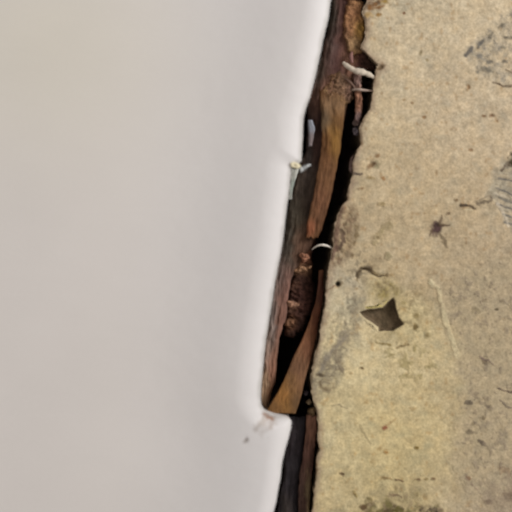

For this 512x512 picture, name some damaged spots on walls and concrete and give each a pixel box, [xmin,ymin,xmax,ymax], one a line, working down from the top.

spalling [352,153,387,191]
spalling [329,202,362,272]
crack [355,252,387,284]
peeling [359,241,512,512]